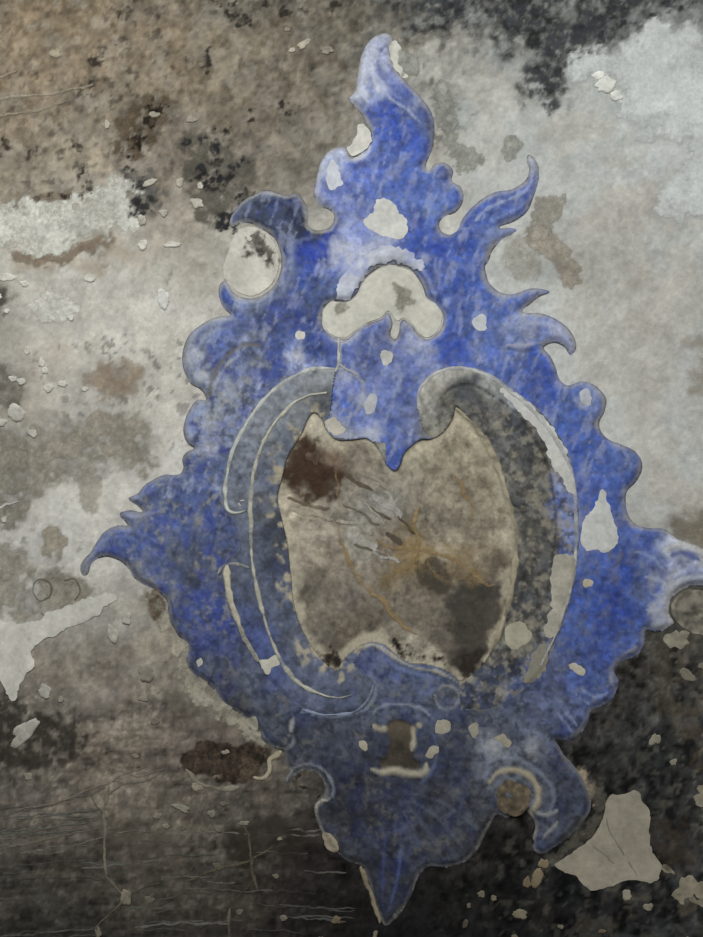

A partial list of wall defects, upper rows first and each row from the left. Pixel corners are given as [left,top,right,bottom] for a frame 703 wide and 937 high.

water stain [373,0,702,109]
water stain [114,95,172,217]
water stain [177,128,254,234]
peeling [223,226,279,296]
peeling [323,198,442,338]
water stain [0,526,92,620]
peeling [580,489,619,553]
peeling [0,592,117,702]
water stain [0,691,94,778]
spalling [138,588,282,833]
crack [0,773,381,937]
spalling [523,768,703,907]